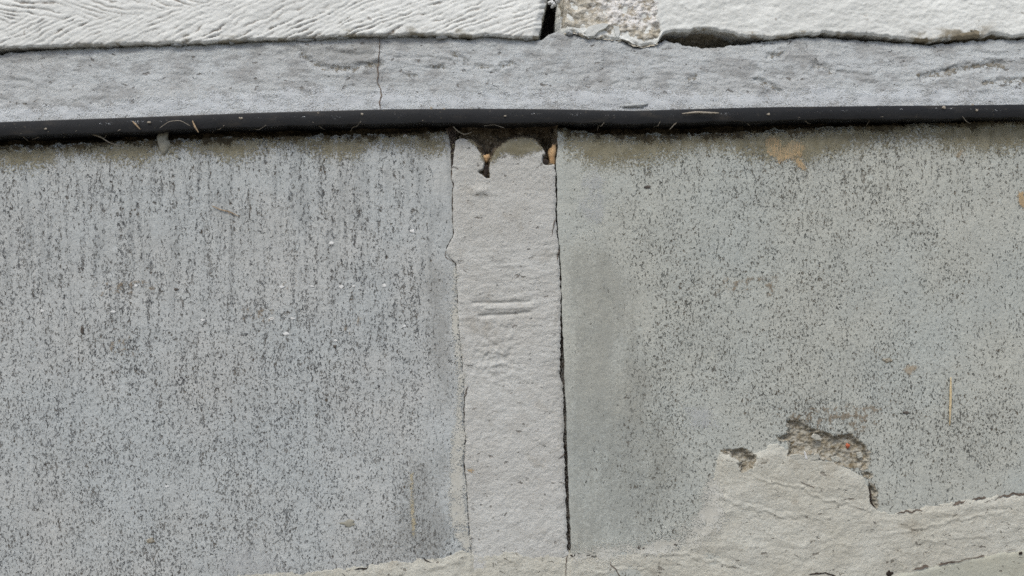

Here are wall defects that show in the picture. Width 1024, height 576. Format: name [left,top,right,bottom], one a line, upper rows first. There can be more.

spalling [558,0,735,49]
spalling [930,30,1003,46]
crack [445,126,472,546]
crack [551,164,620,576]
spalling [721,447,757,476]
spalling [777,418,879,509]